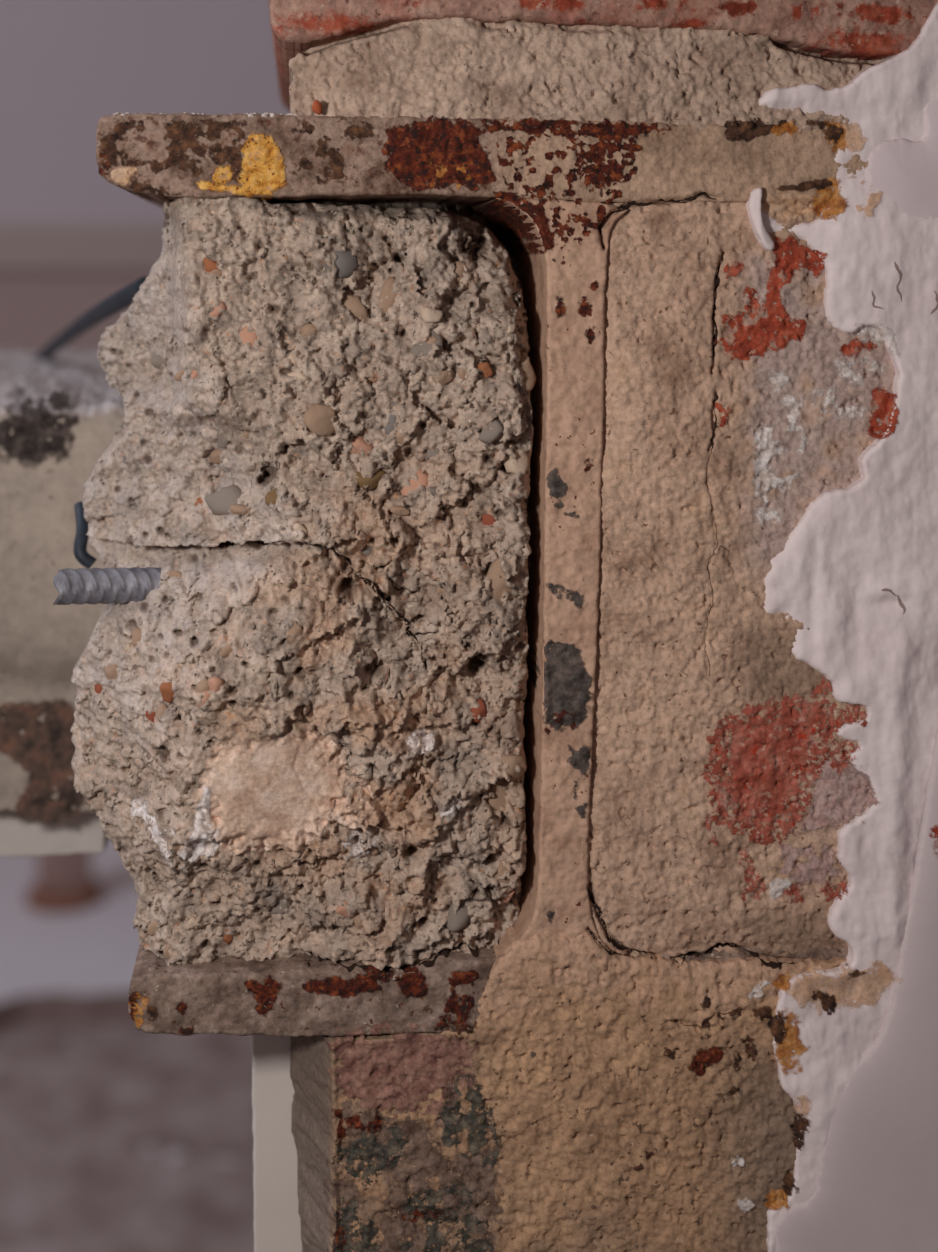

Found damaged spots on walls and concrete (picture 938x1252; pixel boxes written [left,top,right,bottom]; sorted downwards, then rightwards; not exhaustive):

corrosion [98,119,247,205]
corrosion [291,115,671,261]
corrosion [555,281,598,344]
peeling [714,187,827,361]
crack [704,252,734,677]
peeling [867,387,899,439]
spalling [0,132,593,980]
crack [207,541,435,673]
peeling [700,677,879,903]
crack [587,889,793,970]
corrosion [244,975,281,1018]
corrosion [302,965,479,1035]